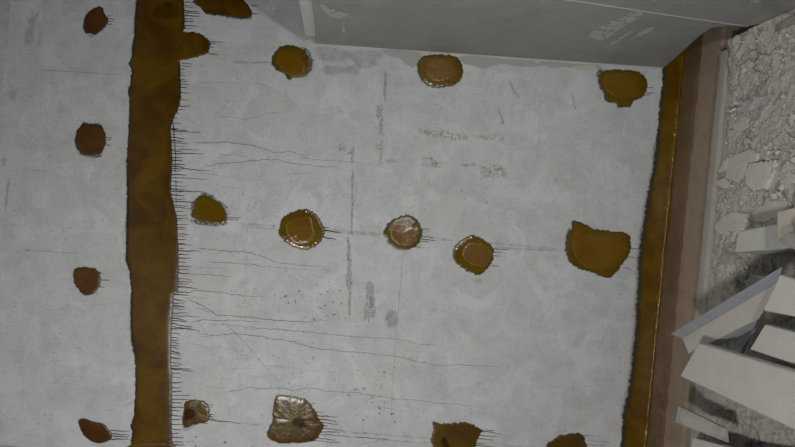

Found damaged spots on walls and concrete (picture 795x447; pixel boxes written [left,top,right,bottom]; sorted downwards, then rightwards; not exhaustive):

crack [196,141,331,175]
crack [187,248,473,366]